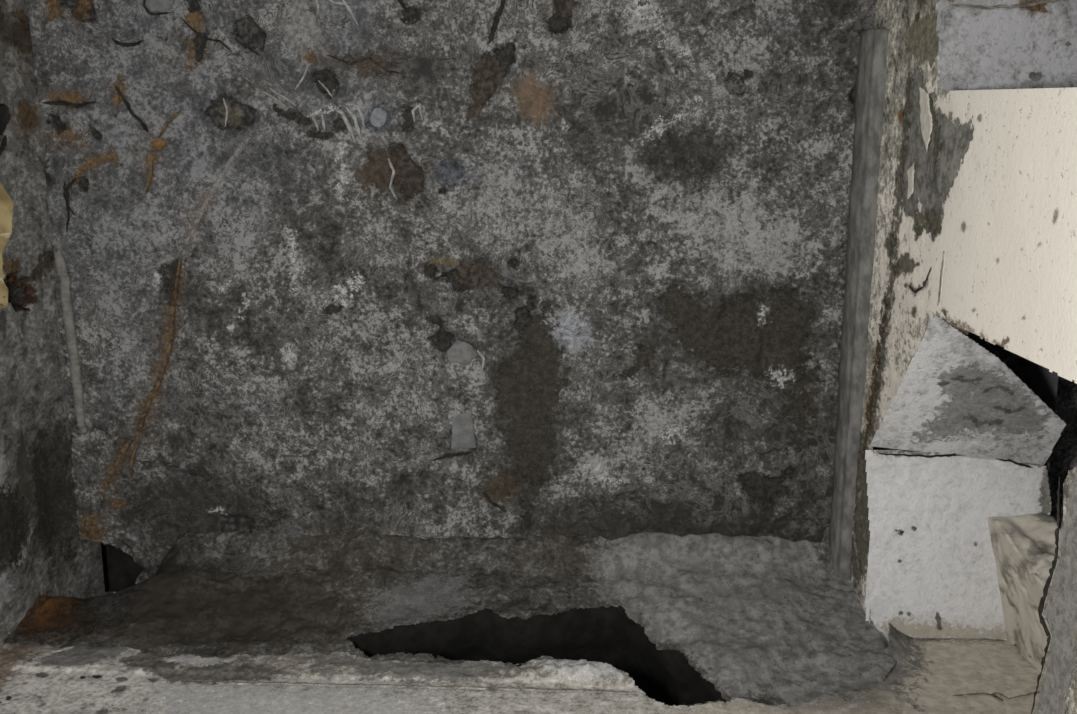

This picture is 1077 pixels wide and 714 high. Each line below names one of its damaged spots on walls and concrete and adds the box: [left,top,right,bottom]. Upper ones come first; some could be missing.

water stain [0,0,33,55]
spalling [0,104,10,135]
flaking render [898,66,974,242]
flaking render [884,232,931,317]
water stain [448,152,733,541]
spalling [101,542,144,592]
rust [0,595,97,683]
spalling [302,605,728,707]